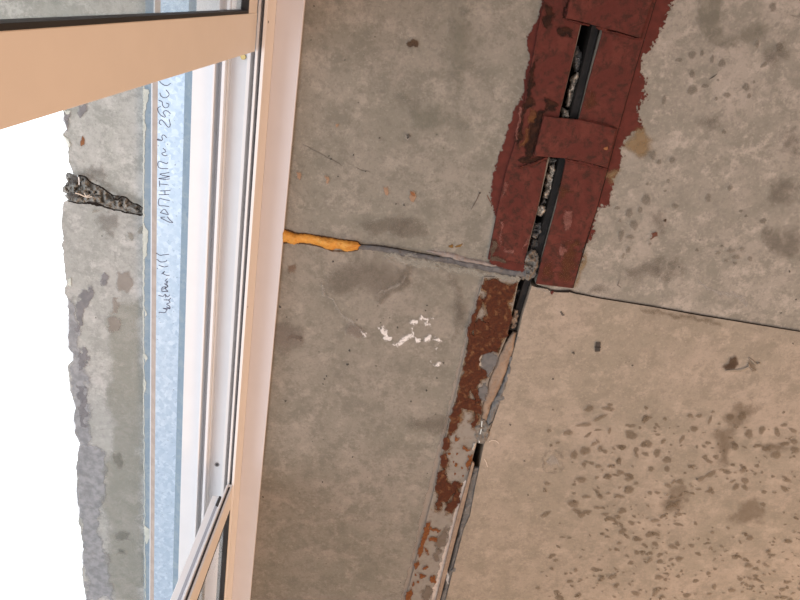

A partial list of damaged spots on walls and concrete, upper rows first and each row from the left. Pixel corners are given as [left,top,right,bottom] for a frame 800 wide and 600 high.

corrosion [542,0,573,38]
corrosion [514,60,559,164]
leakage [379,314,442,349]
corrosion [435,278,518,514]
leakage [564,404,800,600]
corrosion [405,523,441,600]